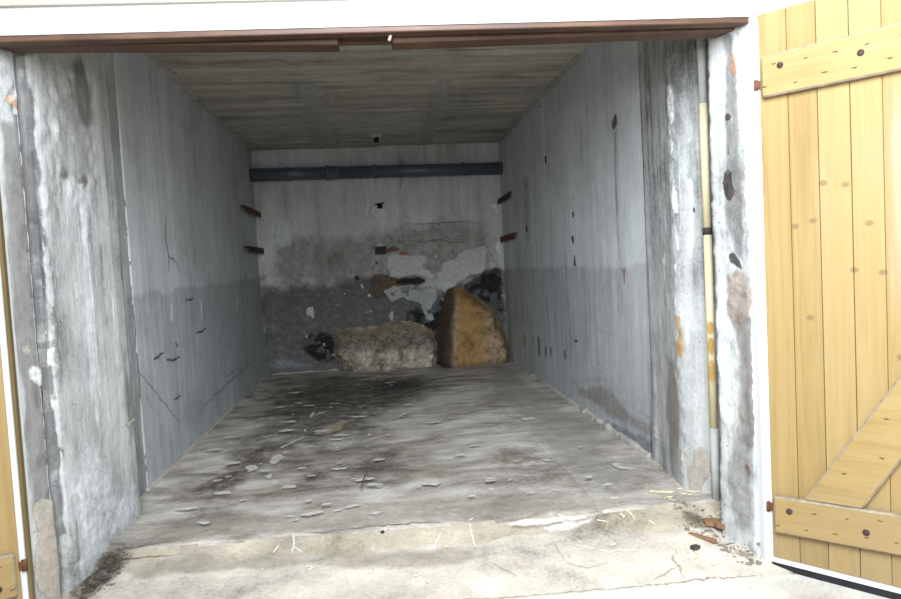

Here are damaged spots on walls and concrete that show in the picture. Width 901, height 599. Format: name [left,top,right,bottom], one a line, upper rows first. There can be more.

spalling [723,170,750,220]
damp [261,226,508,375]
peeling [376,246,488,320]
corrosion [675,316,683,357]
peeling [684,447,711,492]